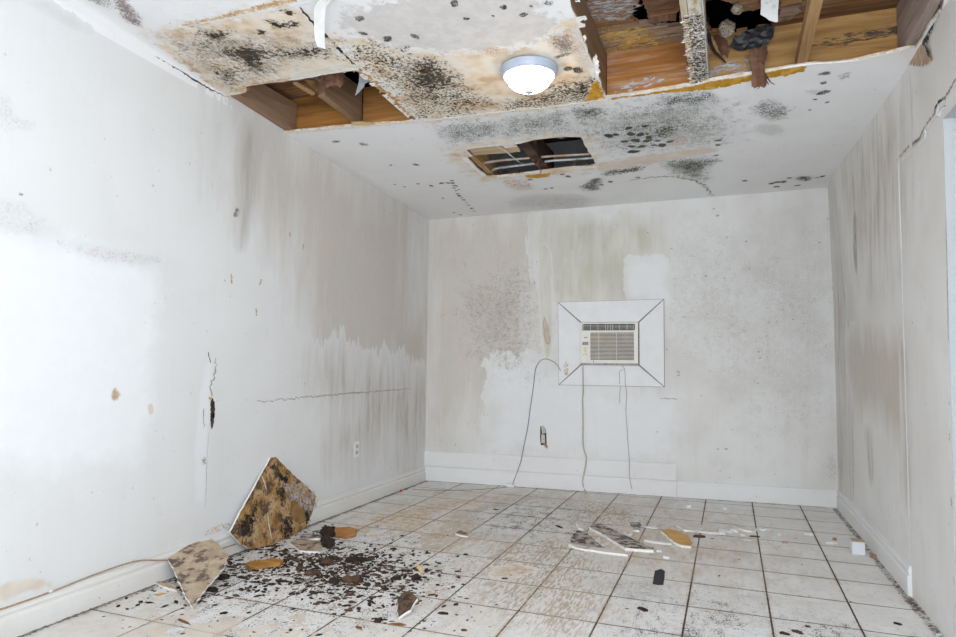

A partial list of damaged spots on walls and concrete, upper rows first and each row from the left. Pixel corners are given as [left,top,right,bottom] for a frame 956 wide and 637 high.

leakage [17,0,95,36]
peeling [584,0,752,101]
peeling [765,66,807,78]
crack [899,79,956,161]
leakage [88,0,914,519]
crack [203,352,217,508]
leakage [26,462,849,637]